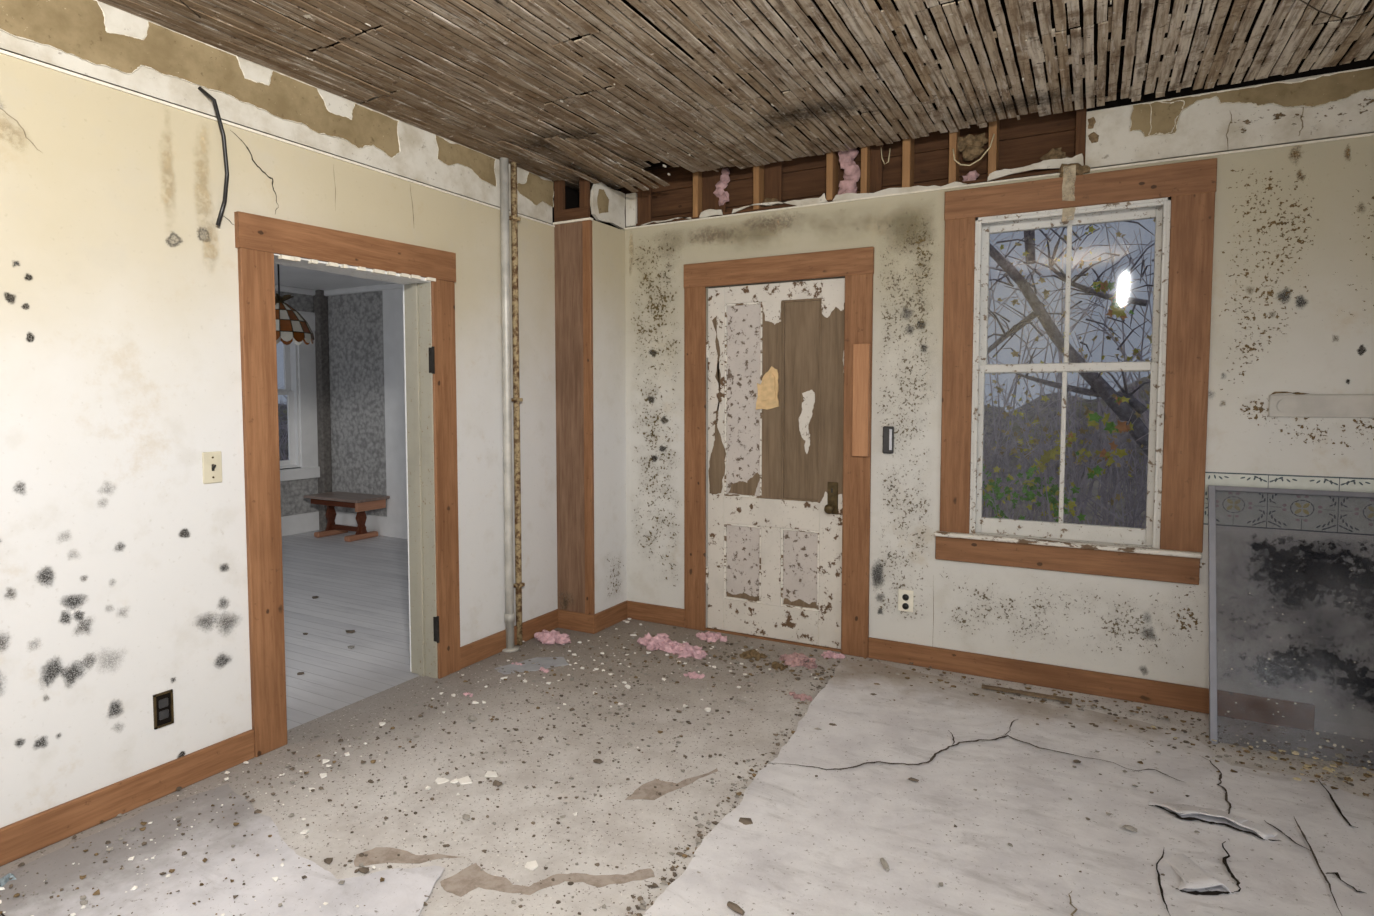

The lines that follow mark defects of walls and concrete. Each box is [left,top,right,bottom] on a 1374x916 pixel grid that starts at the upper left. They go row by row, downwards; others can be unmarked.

peeling [0,0,401,158]
peeling [435,135,497,187]
peeling [517,172,554,207]
spalling [1088,117,1099,143]
peeling [1129,67,1374,137]
leakage [1219,168,1374,455]
leakage [631,238,682,587]
leakage [873,212,1205,674]
leakage [37,568,53,585]
leakage [61,576,91,633]
leakage [42,655,95,700]
crack [778,719,1365,915]